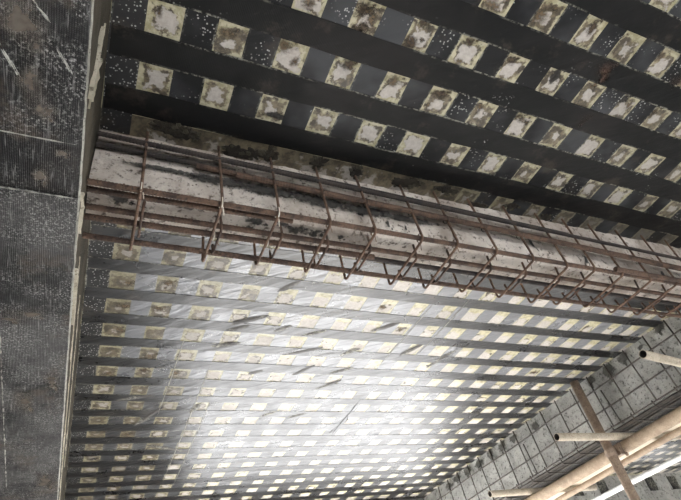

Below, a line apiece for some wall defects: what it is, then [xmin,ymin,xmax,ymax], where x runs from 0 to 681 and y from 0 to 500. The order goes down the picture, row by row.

spalling [148,120,202,143]
spalling [221,144,280,163]
spalling [349,165,363,180]
spalling [391,177,425,189]
water stain [123,161,439,232]